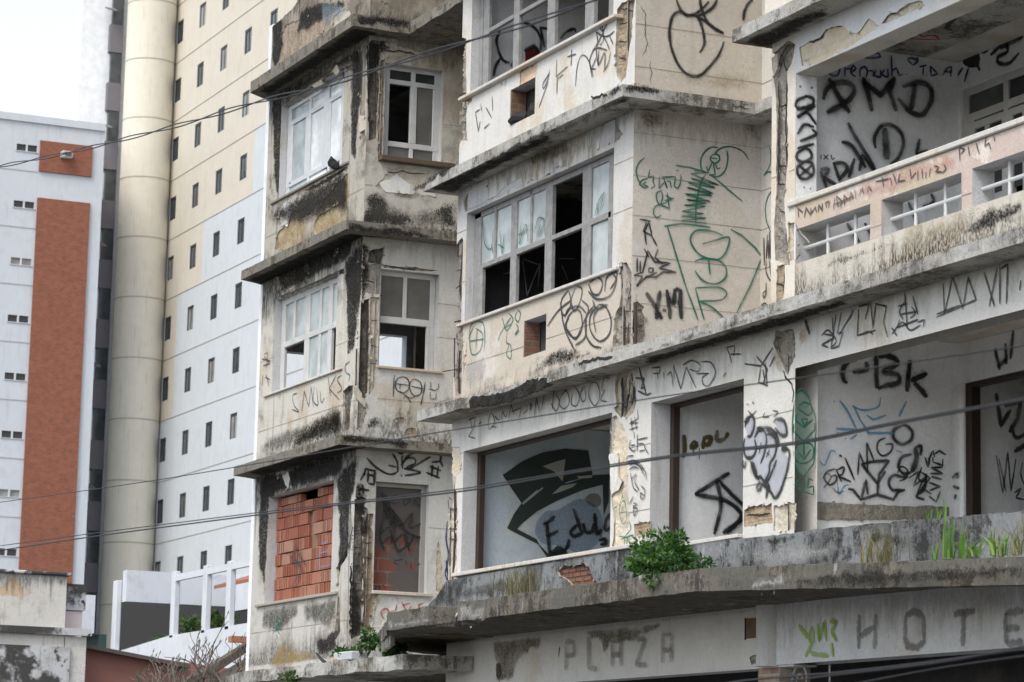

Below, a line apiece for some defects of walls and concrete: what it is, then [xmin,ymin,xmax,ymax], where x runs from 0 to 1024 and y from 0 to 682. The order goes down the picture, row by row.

spalling [771,0,925,302]
peeling [376,167,438,199]
damp [250,84,659,353]
spalling [773,329,796,375]
damp [251,410,408,635]
spalling [744,501,797,533]
damp [756,536,826,563]
spalling [558,563,597,585]
damp [796,566,1022,586]
damp [263,599,336,665]